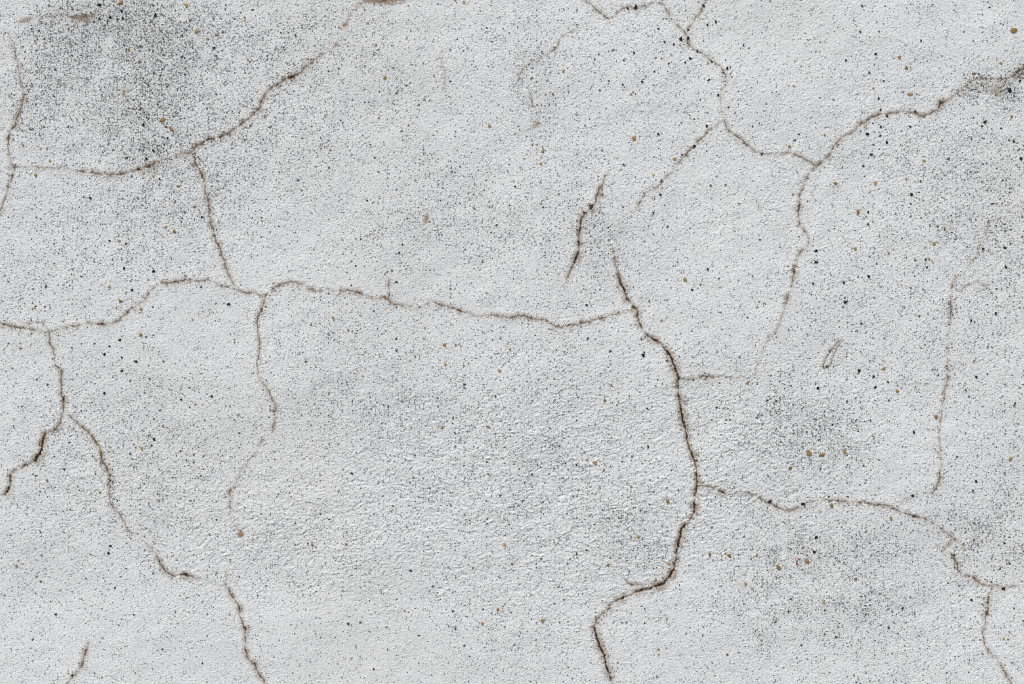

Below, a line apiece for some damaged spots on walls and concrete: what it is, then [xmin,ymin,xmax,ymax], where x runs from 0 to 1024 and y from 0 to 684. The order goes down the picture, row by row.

crack [587,2,726,75]
crack [567,179,604,278]
crack [679,85,968,318]
crack [0,51,402,532]
crack [491,257,1010,681]
crack [156,556,193,579]
crack [229,590,265,682]